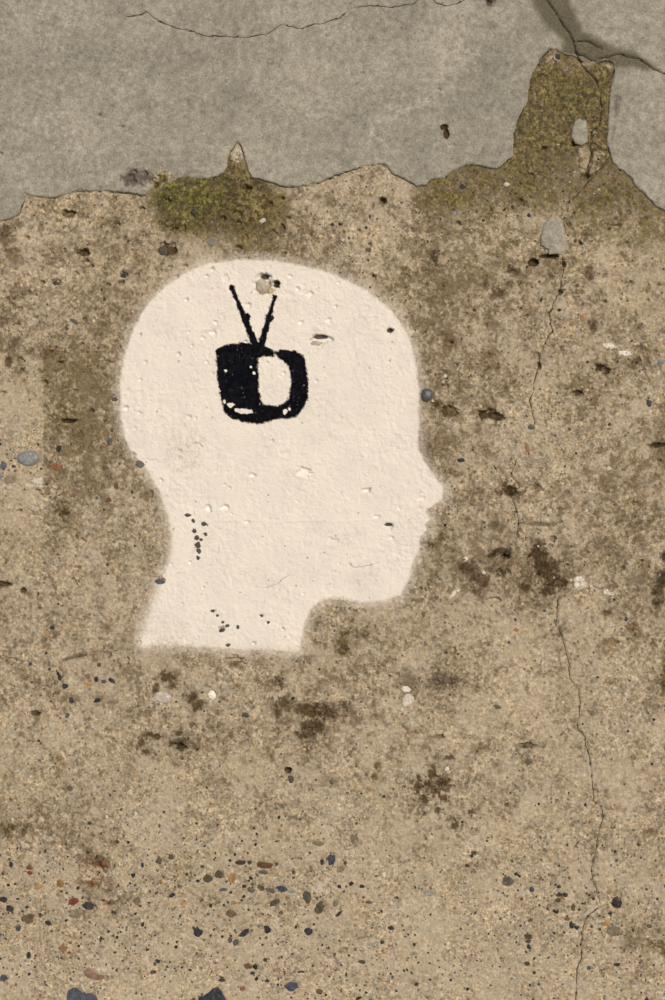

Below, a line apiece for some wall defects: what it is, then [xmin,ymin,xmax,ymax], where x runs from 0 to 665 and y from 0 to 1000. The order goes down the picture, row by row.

crack [127,0,463,38]
crack [547,1,665,200]
spalling [439,123,450,140]
peeling [571,118,610,180]
spalling [117,162,159,191]
spalling [61,208,76,219]
spalling [76,248,92,257]
peeling [526,216,567,268]
crack [529,257,564,421]
crack [507,453,529,540]
spalling [183,513,209,561]
crack [555,597,606,1000]